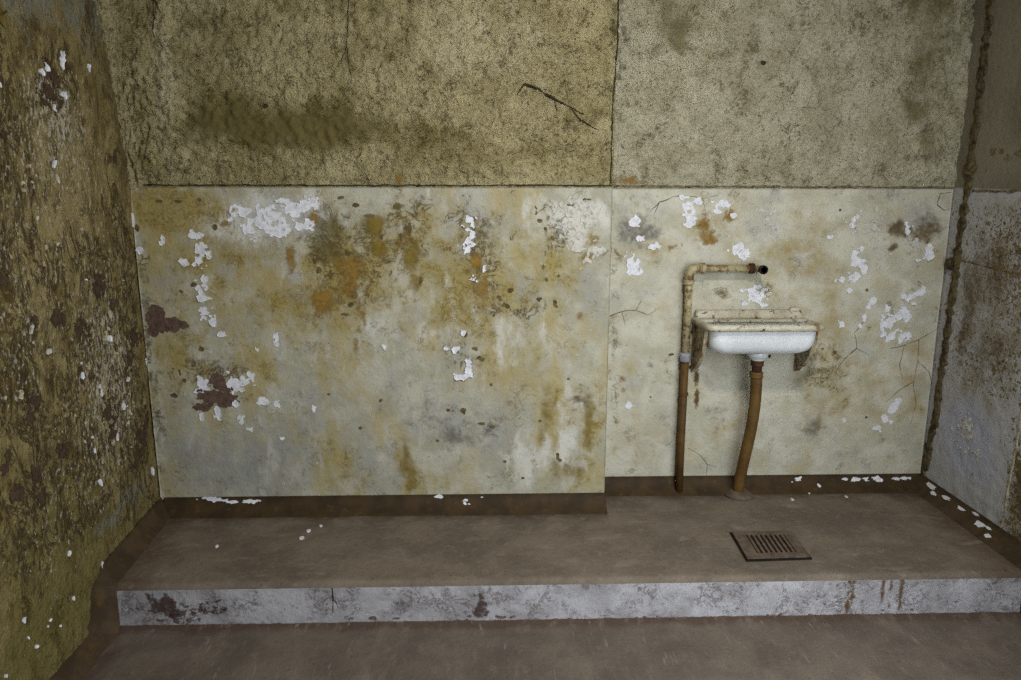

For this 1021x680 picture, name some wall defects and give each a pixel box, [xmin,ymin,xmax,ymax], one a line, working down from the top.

crack [517,83,599,130]
peeling [178,195,319,337]
leakage [254,207,311,229]
corrosion [287,248,295,273]
leakage [367,217,386,256]
peeling [461,215,478,255]
peeling [624,215,661,276]
peeling [679,194,737,228]
peeling [834,246,868,293]
peeling [858,285,926,344]
spalling [50,304,189,476]
spalling [178,369,256,432]